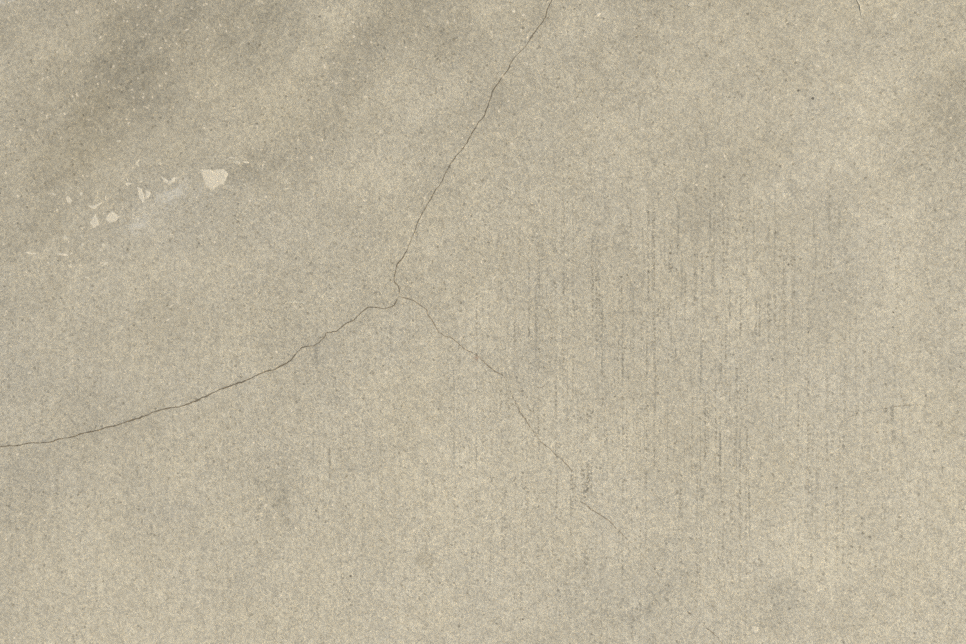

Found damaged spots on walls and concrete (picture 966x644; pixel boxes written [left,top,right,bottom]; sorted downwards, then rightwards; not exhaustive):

crack [0,0,673,592]